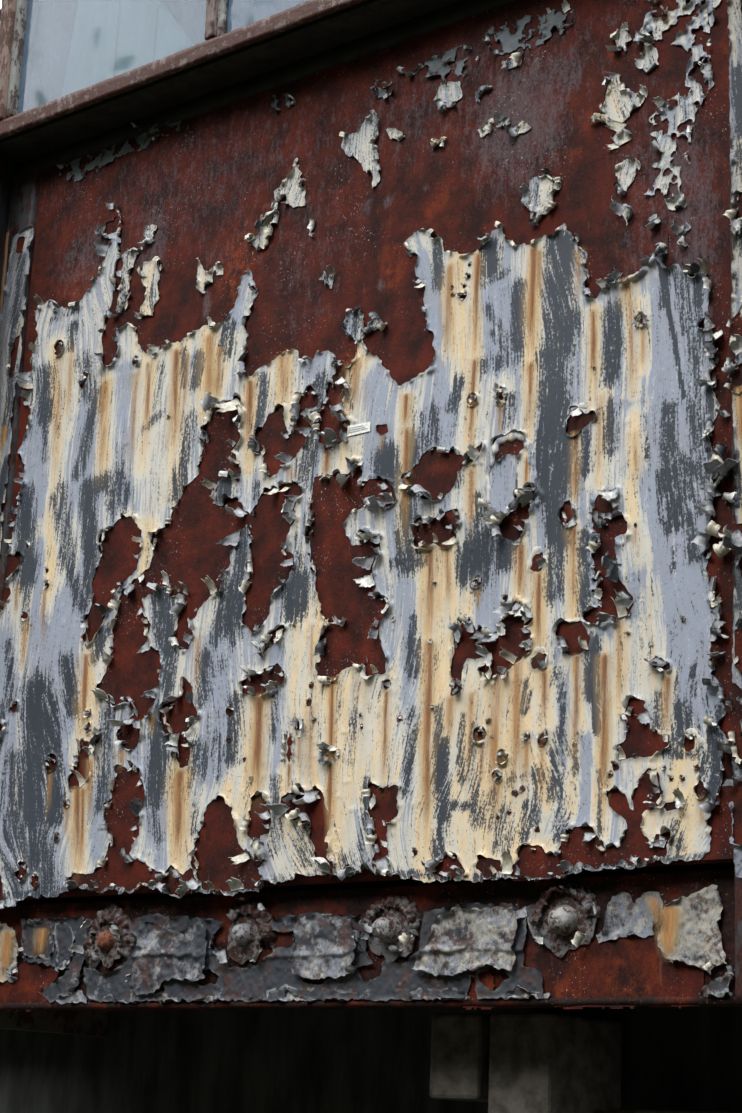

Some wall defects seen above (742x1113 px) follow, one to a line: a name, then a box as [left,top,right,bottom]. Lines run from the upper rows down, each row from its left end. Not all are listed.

corrosion [447,256,479,320]
corrosion [528,250,540,326]
peeling [0,0,742,889]
corrosion [380,678,403,738]
corrosion [661,764,700,781]
peeling [0,884,734,1012]
corrosion [650,900,677,950]